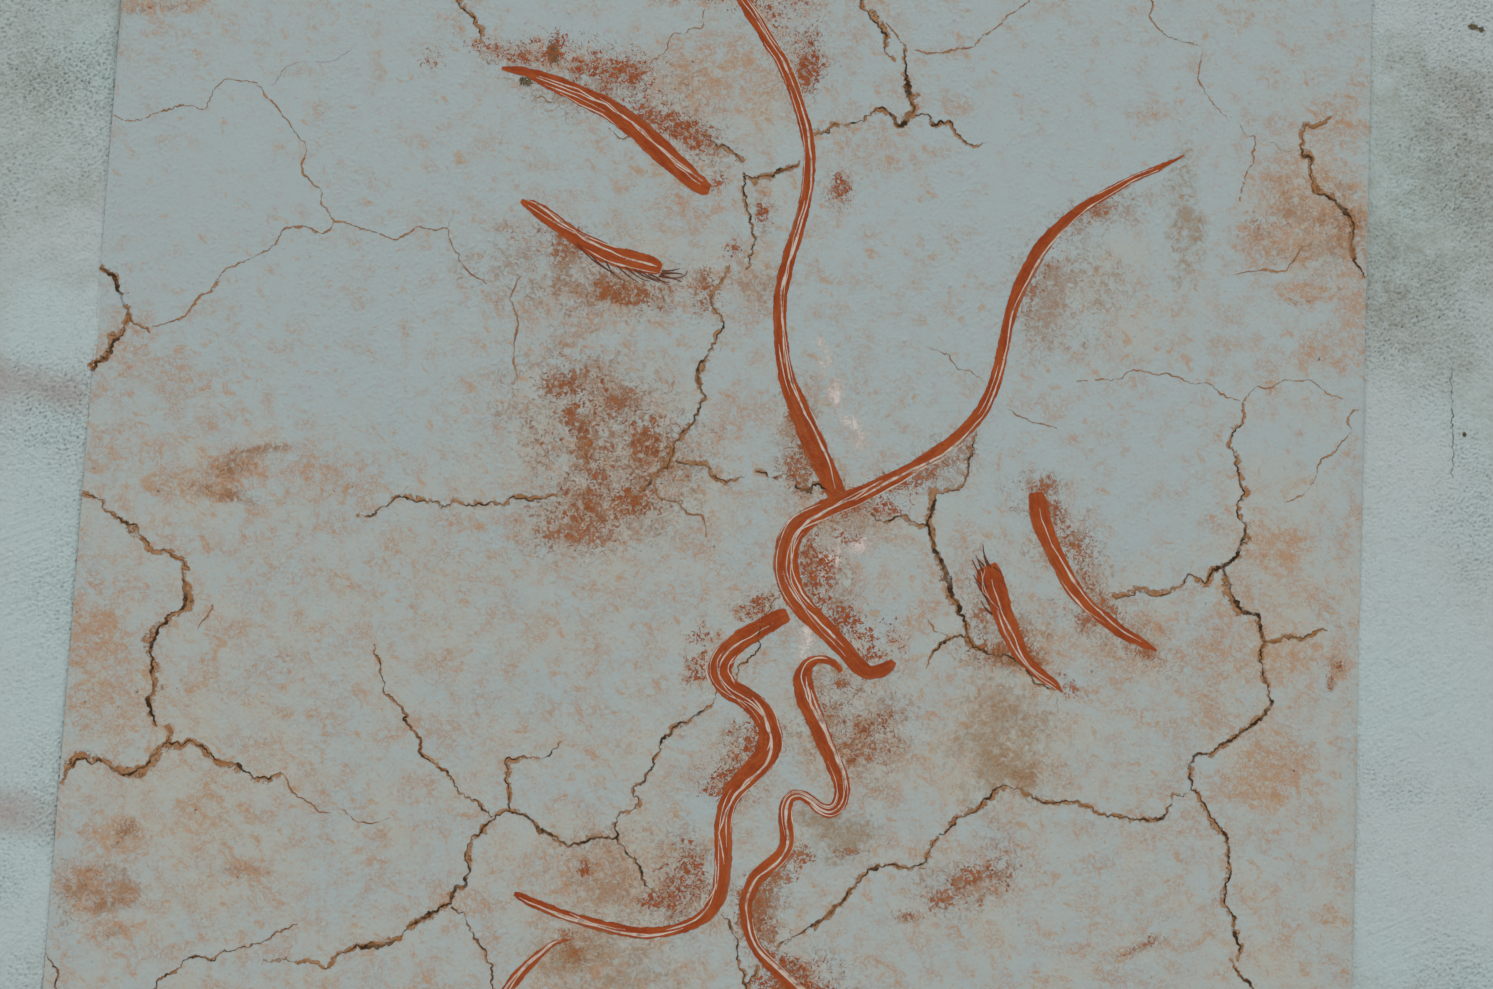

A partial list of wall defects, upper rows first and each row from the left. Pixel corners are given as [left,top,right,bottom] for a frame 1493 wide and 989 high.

crack [88,62,521,373]
crack [456,0,485,44]
crack [639,0,1030,537]
crack [1149,0,1366,278]
crack [59,491,378,824]
crack [356,493,557,517]
crack [155,593,782,989]
crack [721,369,1365,989]